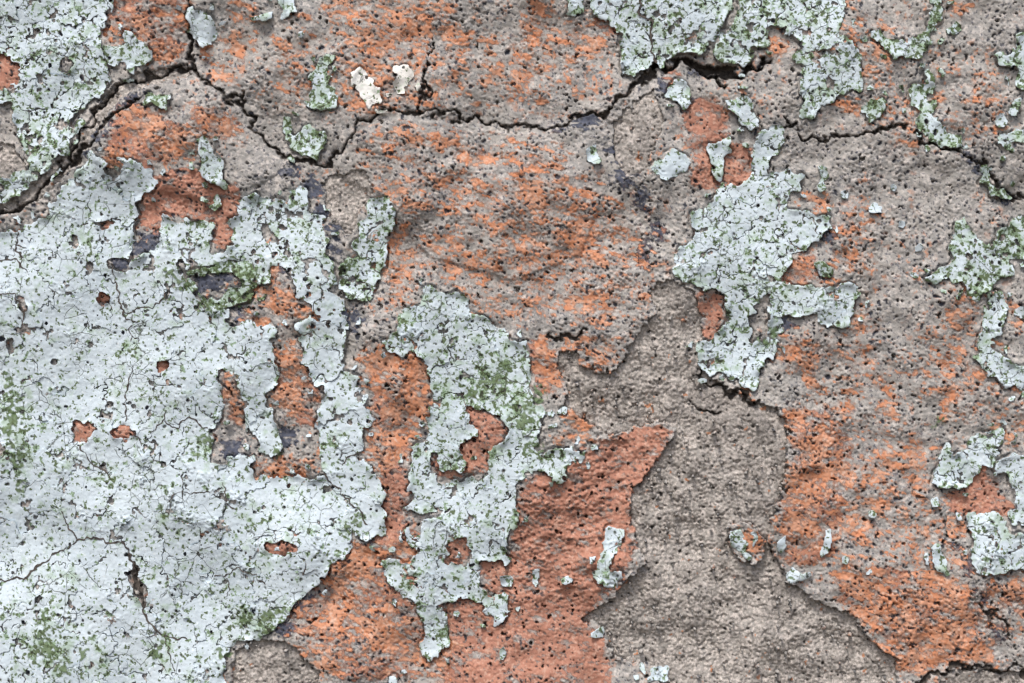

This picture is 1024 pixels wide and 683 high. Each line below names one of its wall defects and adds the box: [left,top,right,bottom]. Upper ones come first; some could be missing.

peeling [277,49,421,171]
crack [0,0,771,329]
spalling [577,79,701,189]
crack [775,116,1024,203]
peeling [974,32,1024,200]
crack [111,263,208,446]
peeling [900,200,1024,401]
crack [169,482,236,510]
crack [324,451,368,525]
peeling [930,419,1024,576]
crack [0,511,188,672]
spalling [939,662,1024,683]